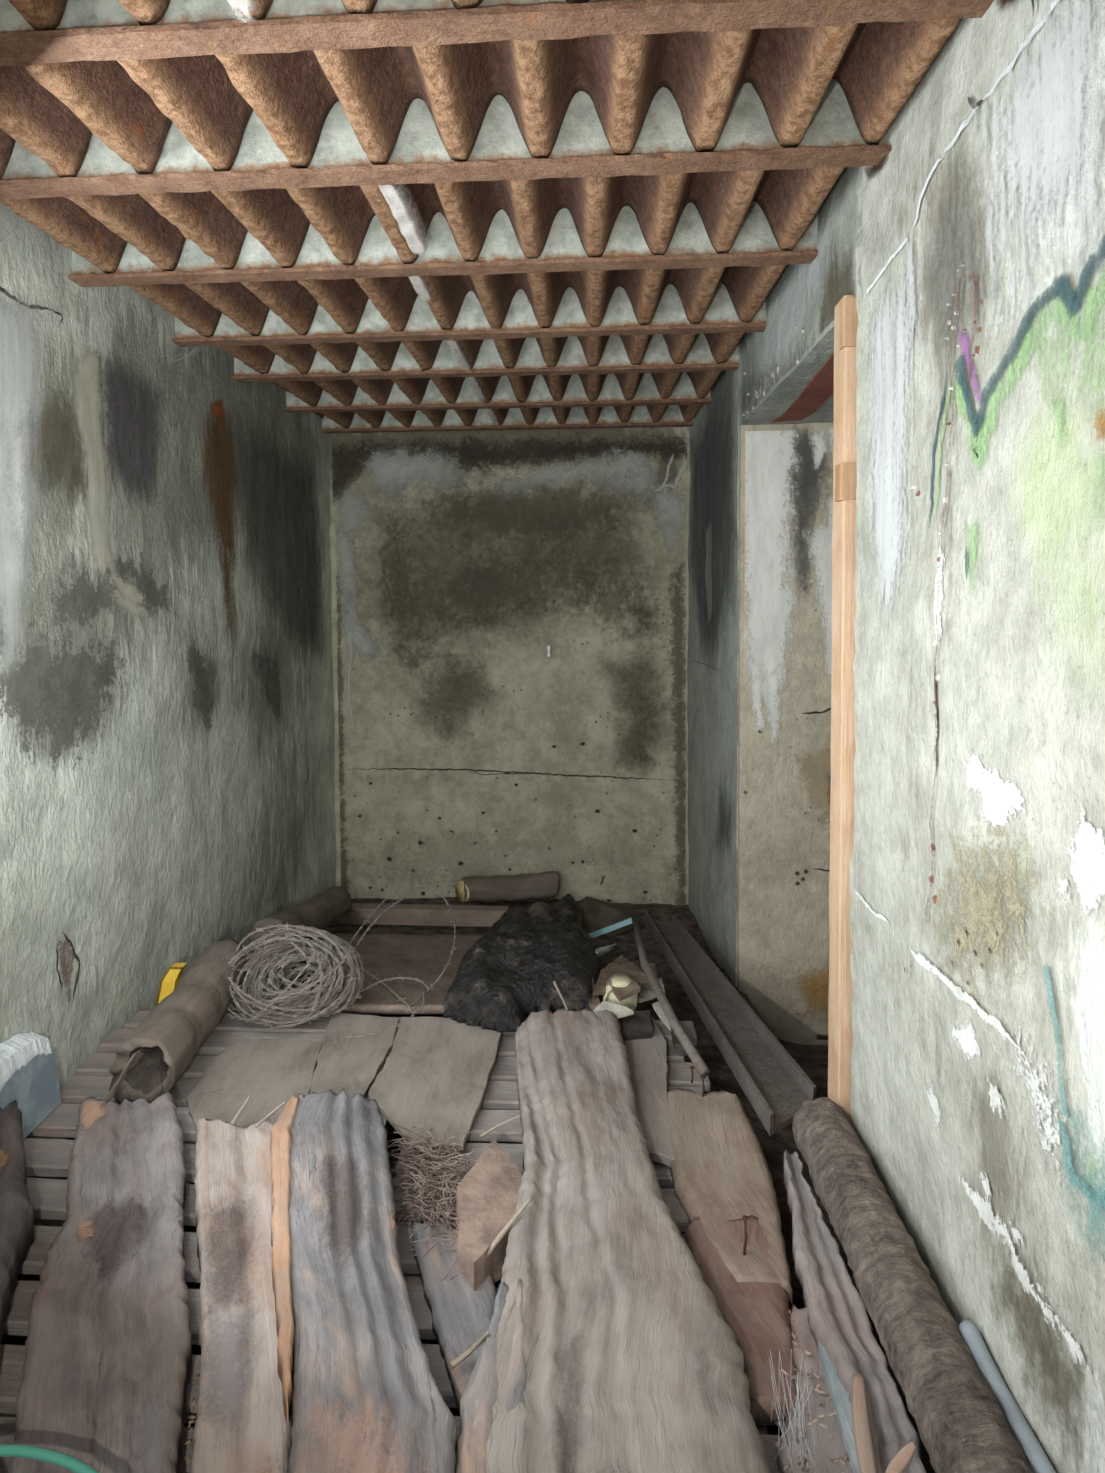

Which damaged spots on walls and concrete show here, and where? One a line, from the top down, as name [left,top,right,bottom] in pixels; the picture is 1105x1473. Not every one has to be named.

damp [227,0,256,22]
damp [378,184,428,255]
crack [0,287,63,324]
damp [409,276,431,301]
damp [446,340,499,425]
damp [0,297,176,771]
corrosion [203,402,236,636]
damp [237,420,834,744]
crack [911,264,983,921]
damp [187,638,217,735]